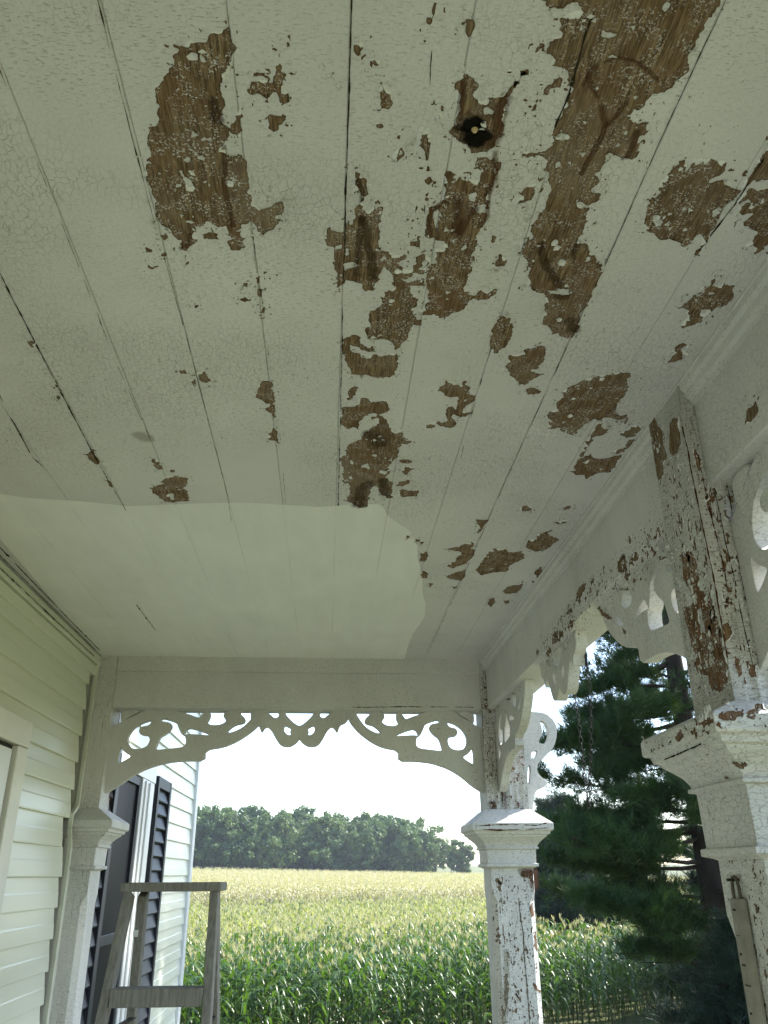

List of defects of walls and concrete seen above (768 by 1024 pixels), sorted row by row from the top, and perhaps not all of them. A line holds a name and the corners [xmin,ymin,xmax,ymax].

peeling [133,17,297,272]
peeling [233,272,278,319]
peeling [318,0,768,753]
peeling [147,458,194,503]
peeling [480,665,528,809]
peeling [492,869,542,1024]
peeling [720,859,768,988]